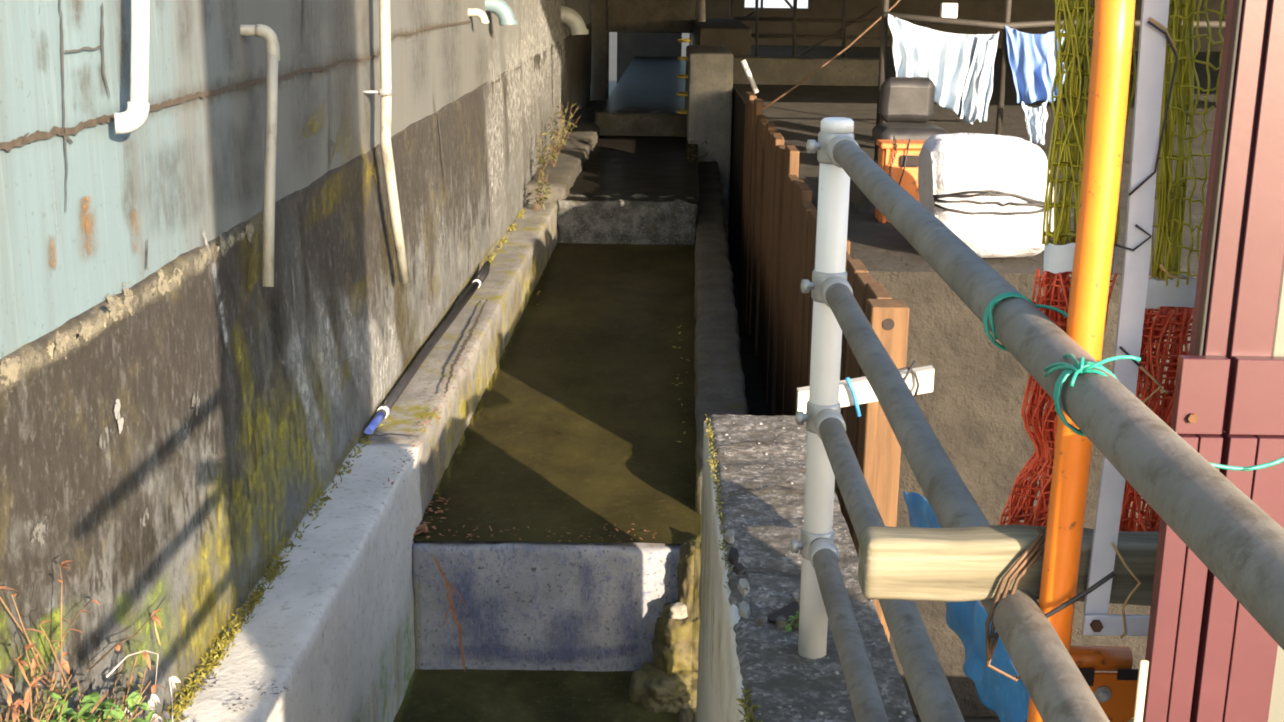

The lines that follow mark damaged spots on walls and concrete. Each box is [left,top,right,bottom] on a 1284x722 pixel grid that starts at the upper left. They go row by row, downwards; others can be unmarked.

crack [0,0,114,212]
crack [149,20,471,111]
corrosion [82,197,93,252]
spalling [0,221,263,392]